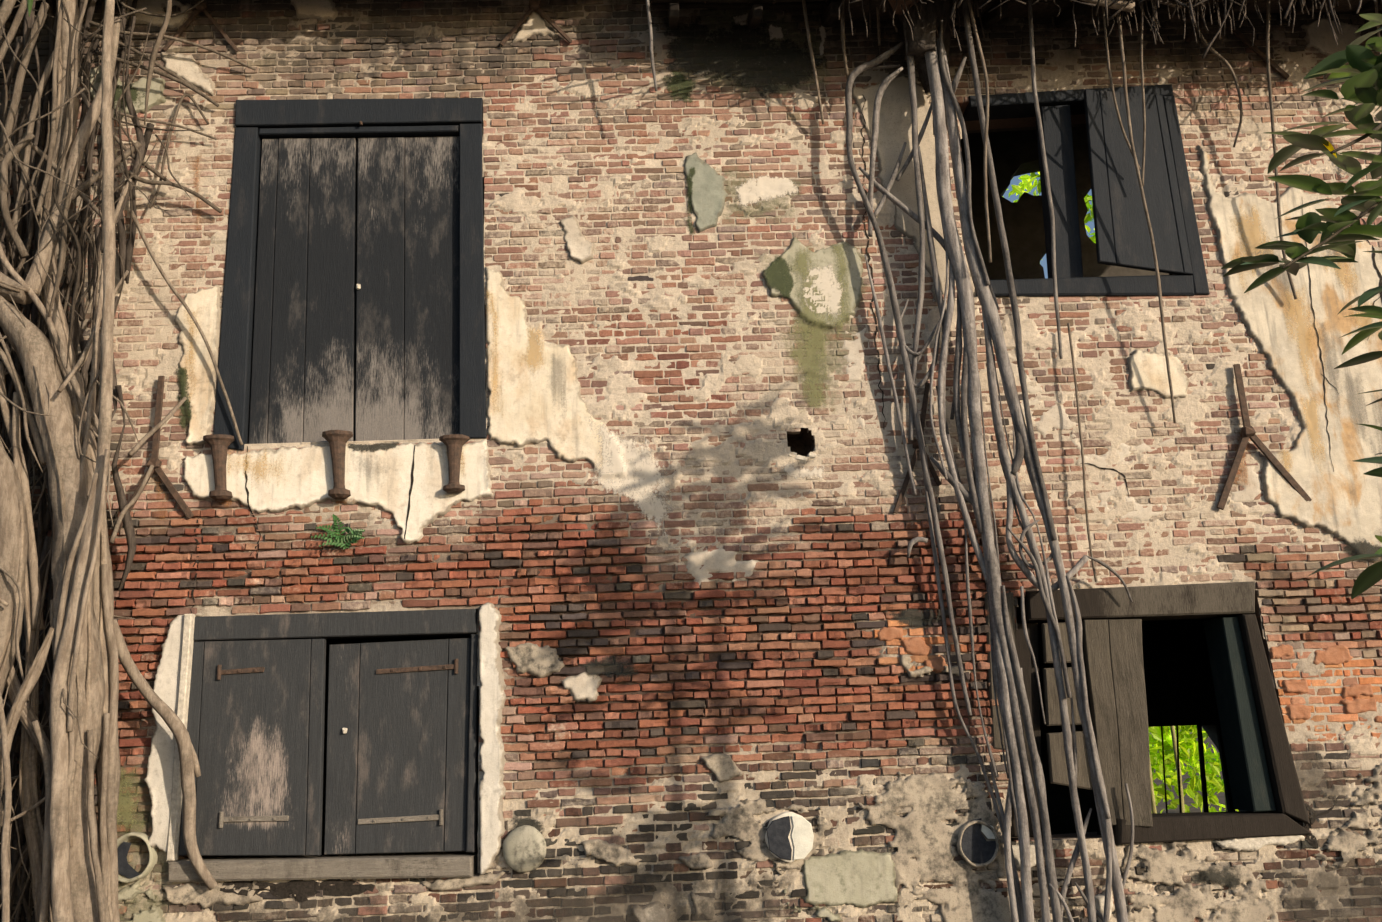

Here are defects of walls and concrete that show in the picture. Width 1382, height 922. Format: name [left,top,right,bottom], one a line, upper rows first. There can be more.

water stain [656,14,827,103]
flaking render [684,152,798,234]
crack [1302,200,1339,470]
flaking render [174,267,672,544]
crack [404,445,415,539]
spalling [784,428,824,479]
spalling [877,627,948,673]
spalling [701,753,743,783]
spalling [582,839,642,867]
spalling [679,771,1036,922]
spalling [1094,765,1382,922]
spalling [633,901,669,922]